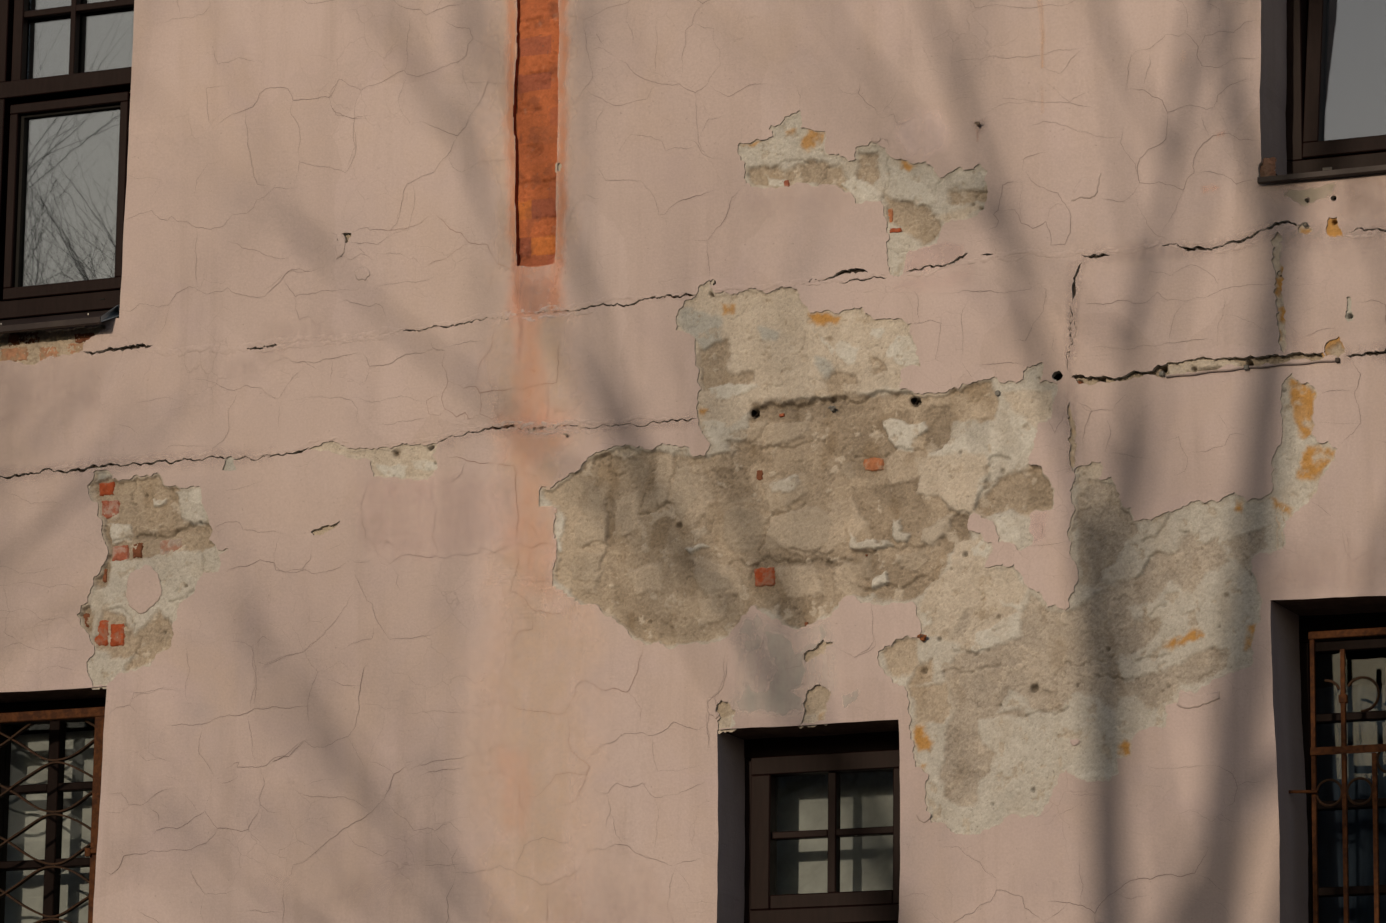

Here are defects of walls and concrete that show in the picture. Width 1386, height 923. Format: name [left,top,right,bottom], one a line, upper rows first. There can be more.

spalling [738,111,988,277]
spalling [1346,297,1354,322]
crack [1315,300,1386,444]
spalling [306,441,438,480]
spalling [78,467,228,690]
spalling [539,280,1345,835]